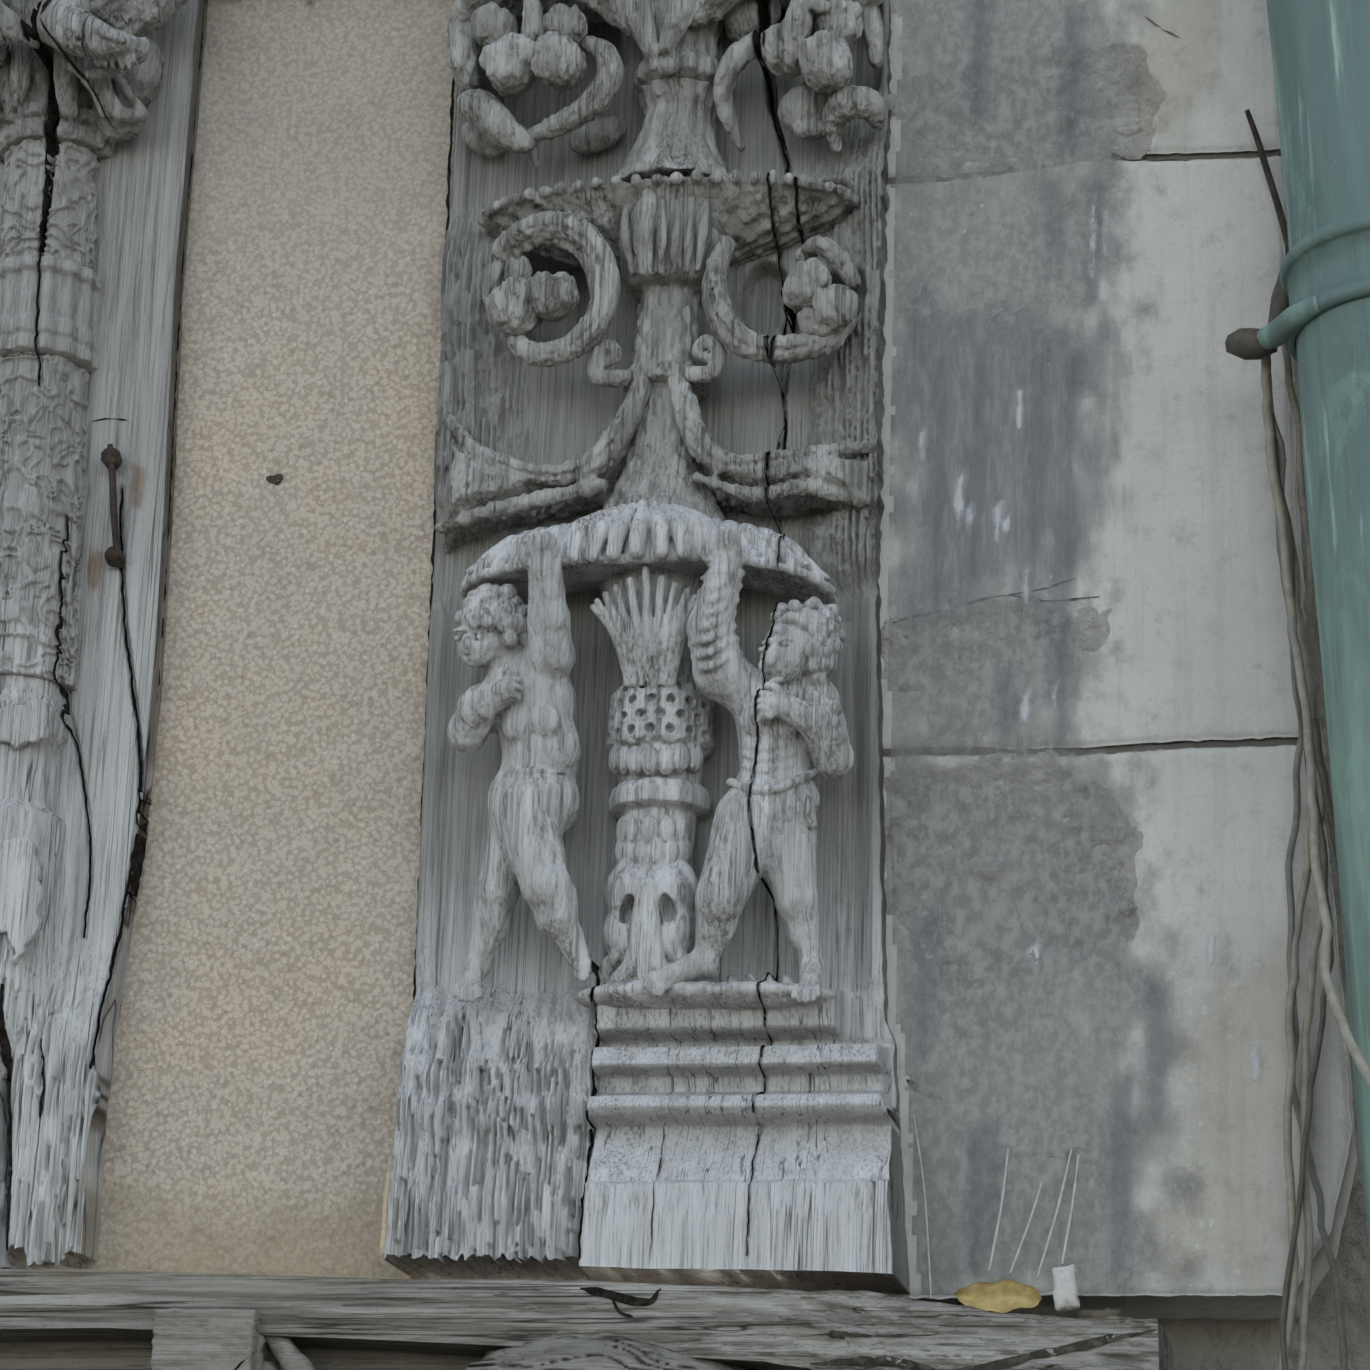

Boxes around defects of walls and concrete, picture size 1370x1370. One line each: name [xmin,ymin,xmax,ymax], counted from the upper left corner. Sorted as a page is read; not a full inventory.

crack [21,0,114,386]
water stain [883,0,1137,769]
spalling [905,43,1167,177]
crack [746,0,804,1255]
crack [0,984,45,1251]
spalling [883,750,1070,1011]
water stain [890,735,1162,1294]
spalling [1048,781,1144,942]